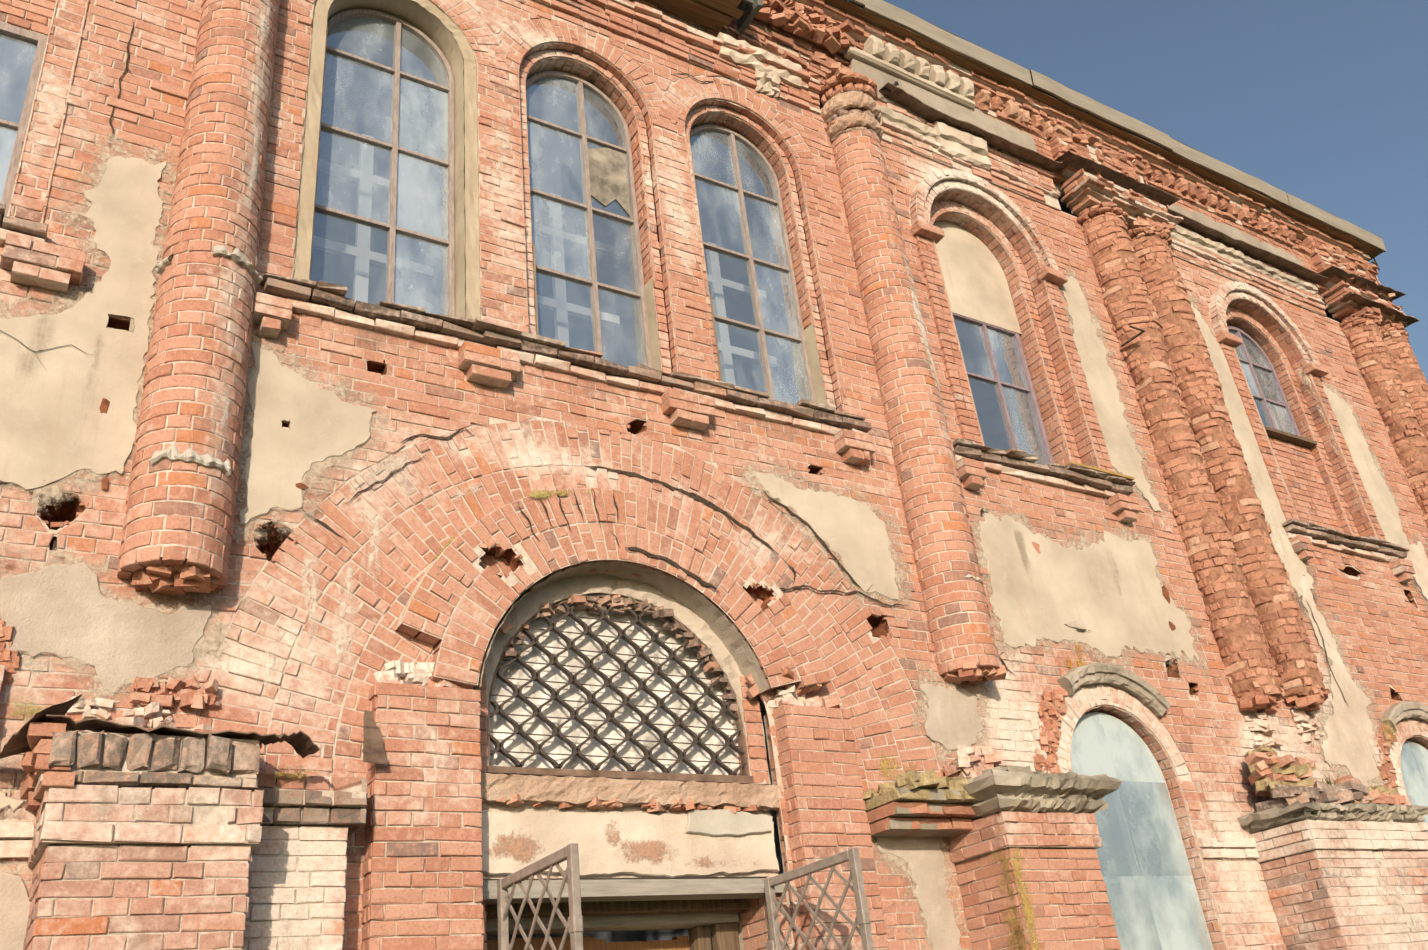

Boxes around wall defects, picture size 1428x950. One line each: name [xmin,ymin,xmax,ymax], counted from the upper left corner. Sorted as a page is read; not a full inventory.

crack [109,19,134,151]
flaking render [0,135,176,509]
flaking render [0,548,227,723]
flaking render [233,338,379,541]
crack [301,427,474,540]
flaking render [742,464,912,621]
flaking render [972,508,1207,669]
flaking render [1188,296,1398,790]
flaking render [0,758,25,821]
flaking render [914,668,1005,767]
spalling [1033,688,1068,774]
flaking render [0,858,31,950]